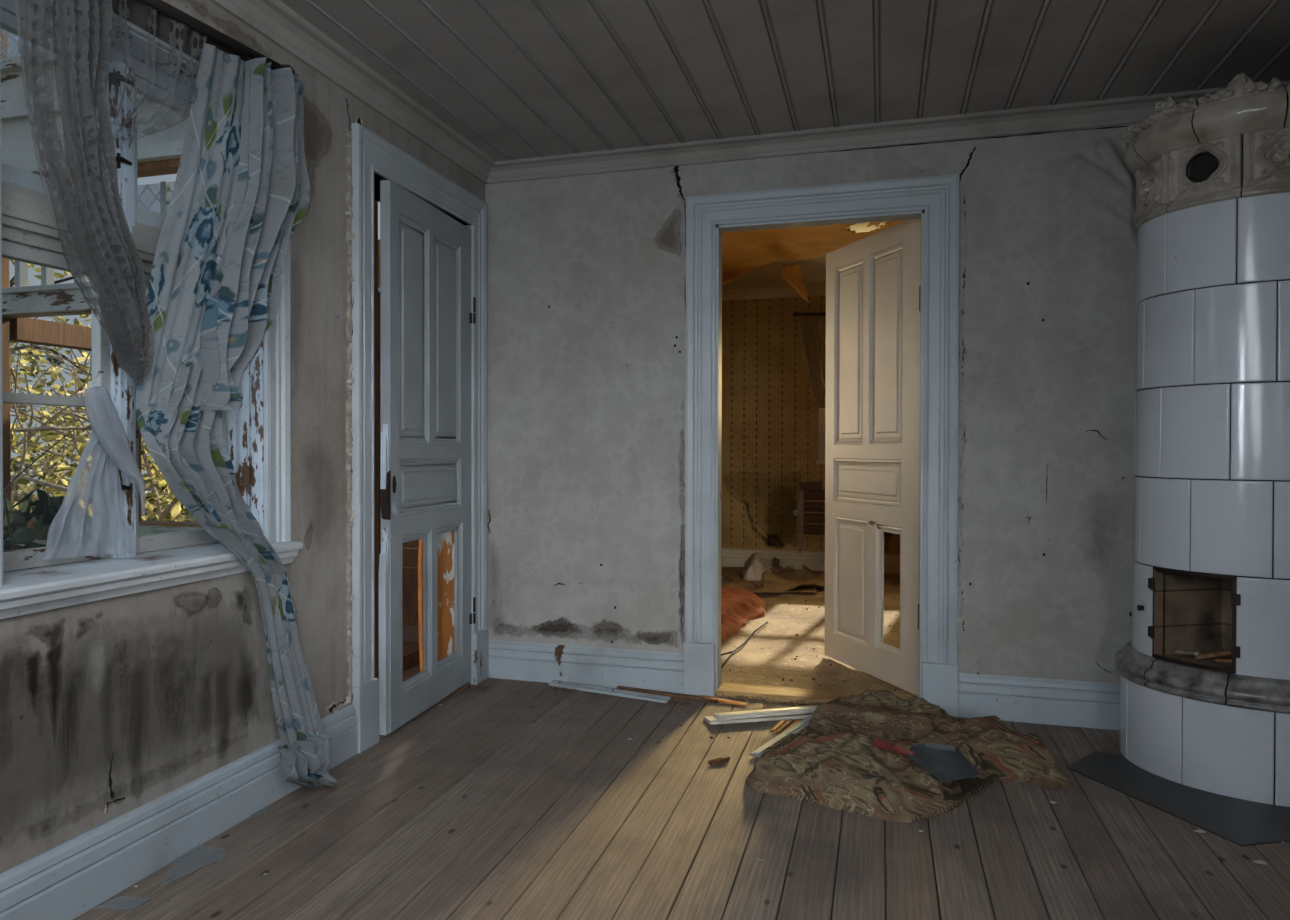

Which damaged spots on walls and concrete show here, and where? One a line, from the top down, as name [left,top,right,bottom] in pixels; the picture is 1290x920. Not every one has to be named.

crack [832,126,1127,181]
crack [671,166,686,320]
water stain [28,626,62,722]